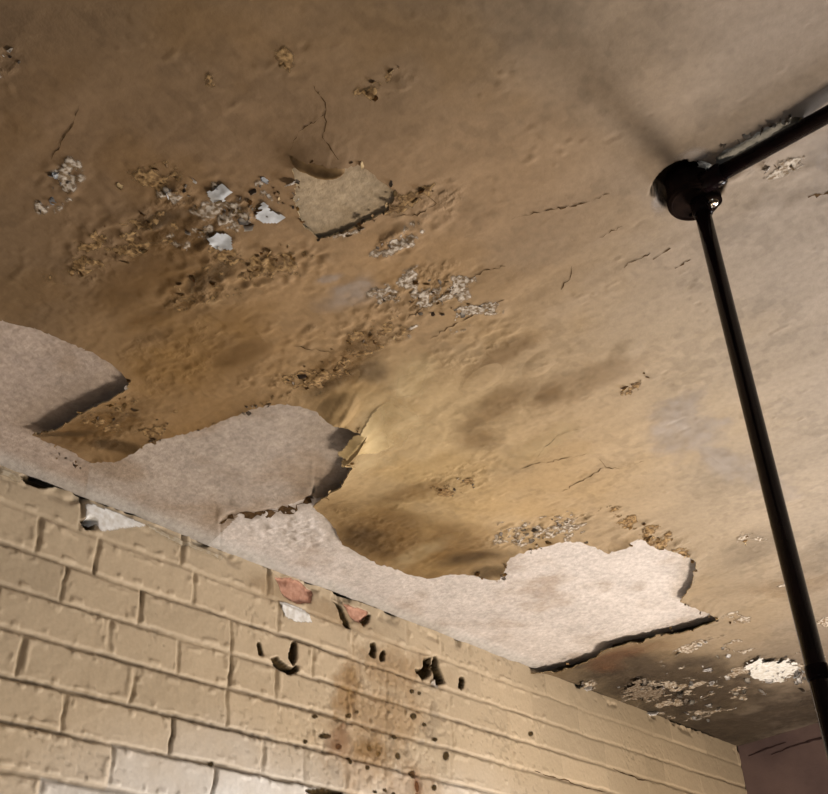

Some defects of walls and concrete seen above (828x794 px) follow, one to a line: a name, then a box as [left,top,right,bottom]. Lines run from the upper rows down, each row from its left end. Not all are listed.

flaking render [67,156,435,311]
peeling [367,266,498,321]
flaking render [0,316,751,675]
hole [415,657,442,688]
peeling [617,635,807,722]
crack [749,736,822,756]